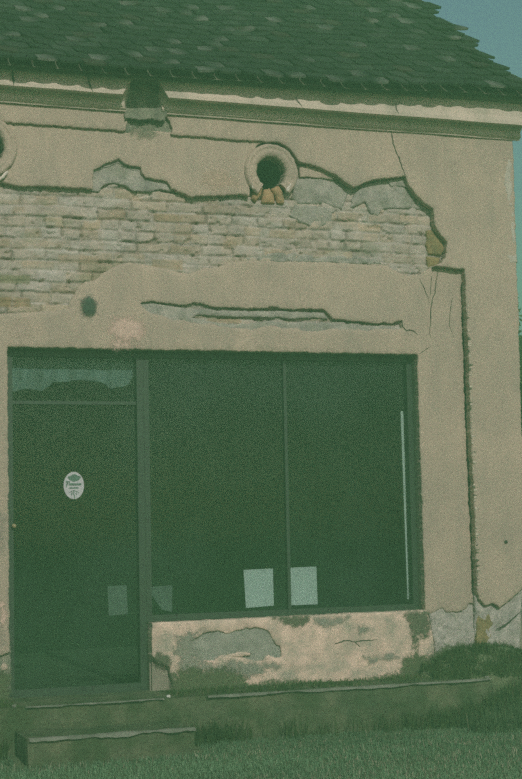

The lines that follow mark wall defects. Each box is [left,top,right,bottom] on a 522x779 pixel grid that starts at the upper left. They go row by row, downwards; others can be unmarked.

crack [391,106,406,176]
crack [402,270,453,353]
spalling [428,484,522,655]
spalling [191,627,281,661]